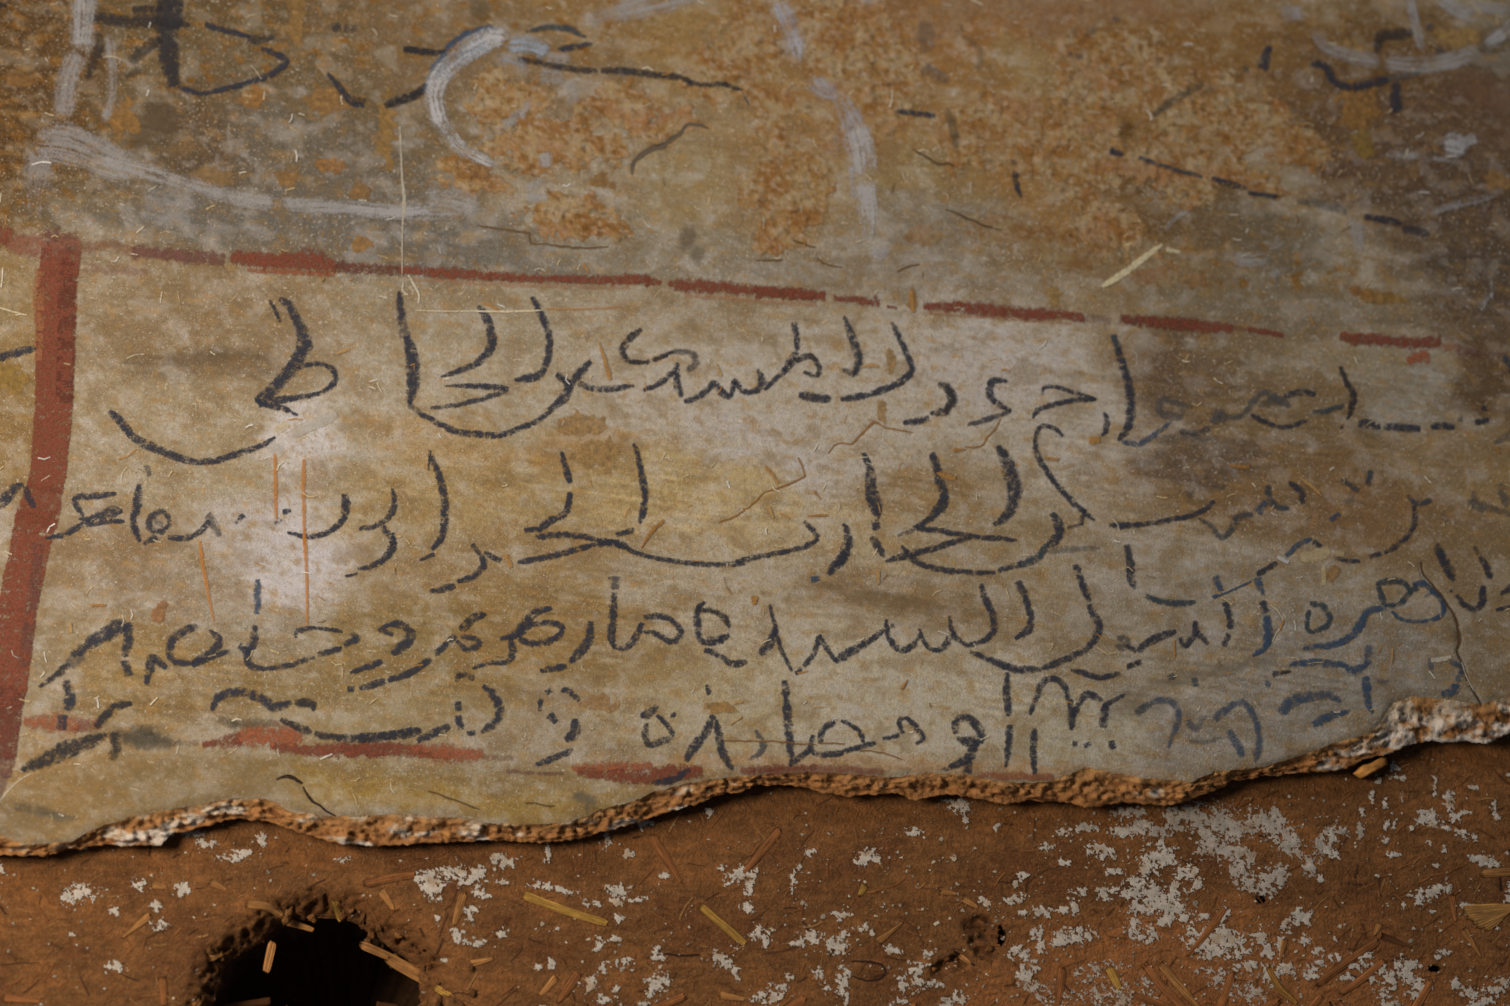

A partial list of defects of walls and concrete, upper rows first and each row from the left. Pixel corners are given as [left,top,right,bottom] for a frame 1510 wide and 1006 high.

peeling [303,87,354,115]
peeling [376,88,398,171]
spalling [413,0,931,256]
spalling [934,26,1381,259]
peeling [273,157,345,188]
peeling [1350,286,1407,305]
peeling [886,349,896,374]
peeling [877,400,887,423]
peeling [554,408,620,473]
peeling [151,600,168,623]
peeling [578,692,620,713]
spalling [0,696,1510,1006]